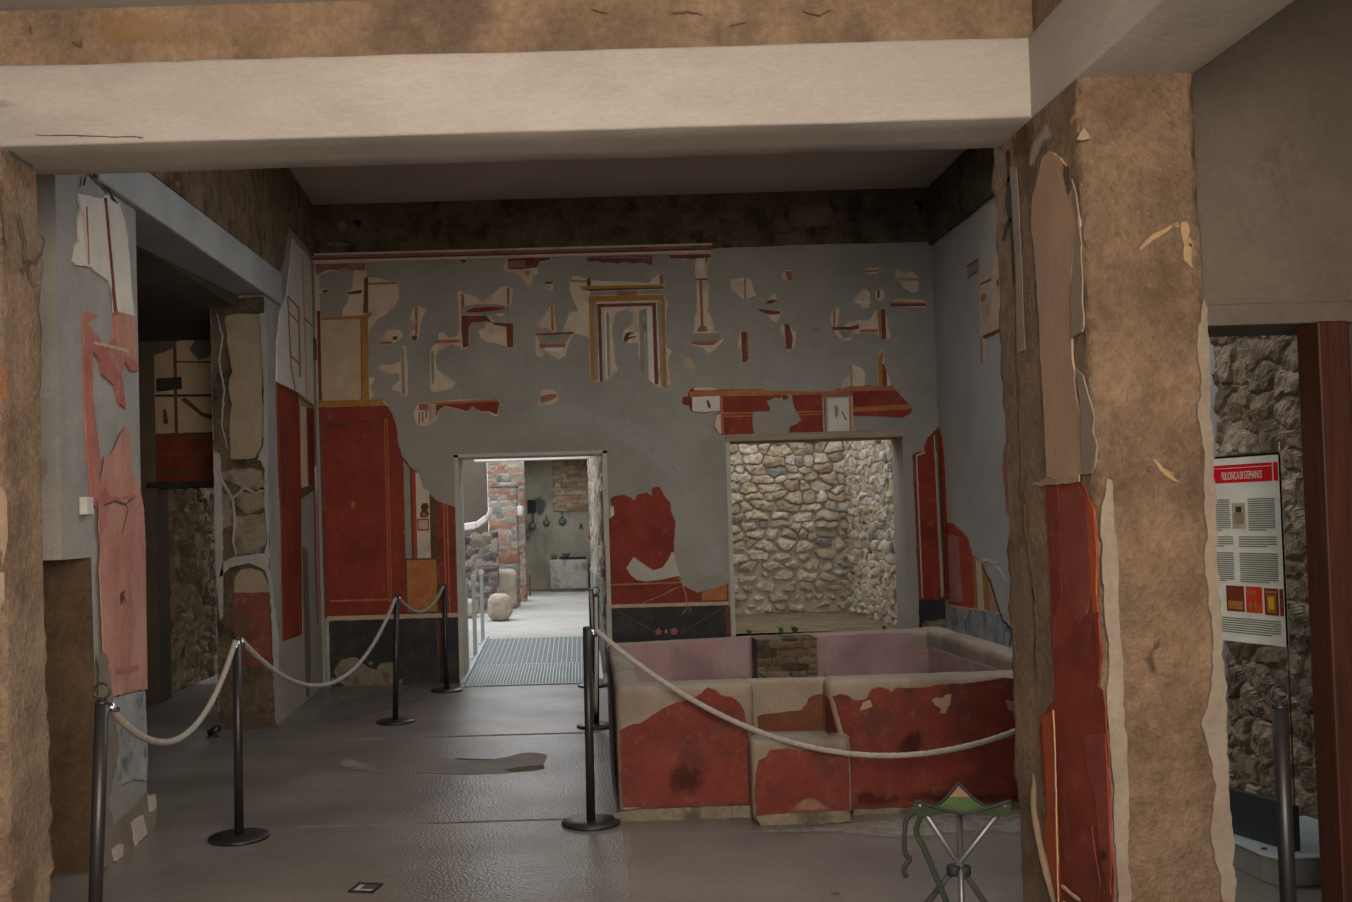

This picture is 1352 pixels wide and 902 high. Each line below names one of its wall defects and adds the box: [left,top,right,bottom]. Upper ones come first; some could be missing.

flaking render [753,394,801,434]
flaking render [1032,474,1080,486]
flaking render [210,297,279,730]
flaking render [626,552,680,581]